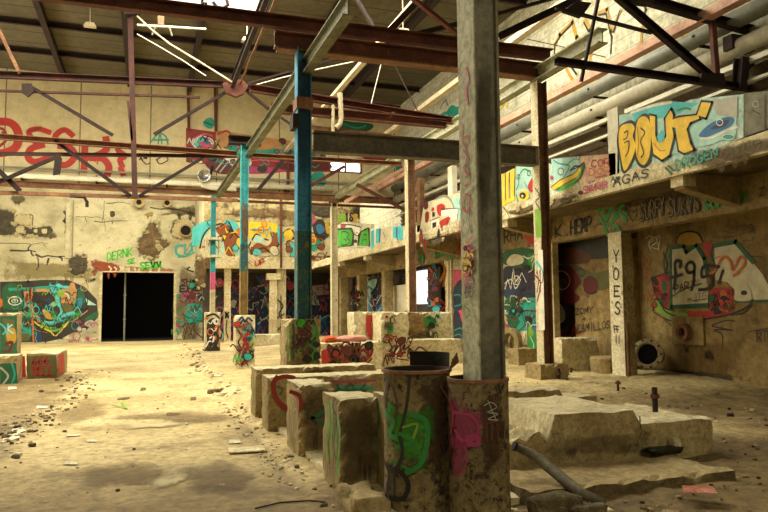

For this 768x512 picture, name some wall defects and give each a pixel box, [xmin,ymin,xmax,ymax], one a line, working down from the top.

rust [298,63,308,97]
rust [298,109,309,174]
peeling [0,209,56,239]
crack [1,214,65,270]
flaking render [136,218,195,261]
flaking render [68,254,88,278]
rust [479,392,505,471]